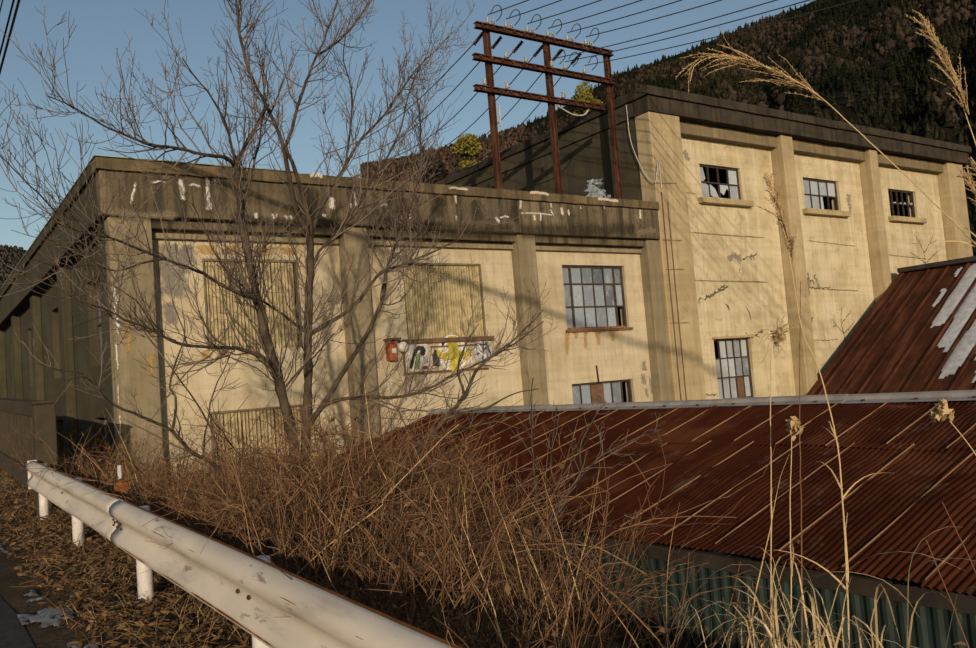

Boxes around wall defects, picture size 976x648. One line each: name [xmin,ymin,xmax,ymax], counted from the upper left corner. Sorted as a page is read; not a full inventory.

crack [699,253,763,340]
crack [807,273,855,341]